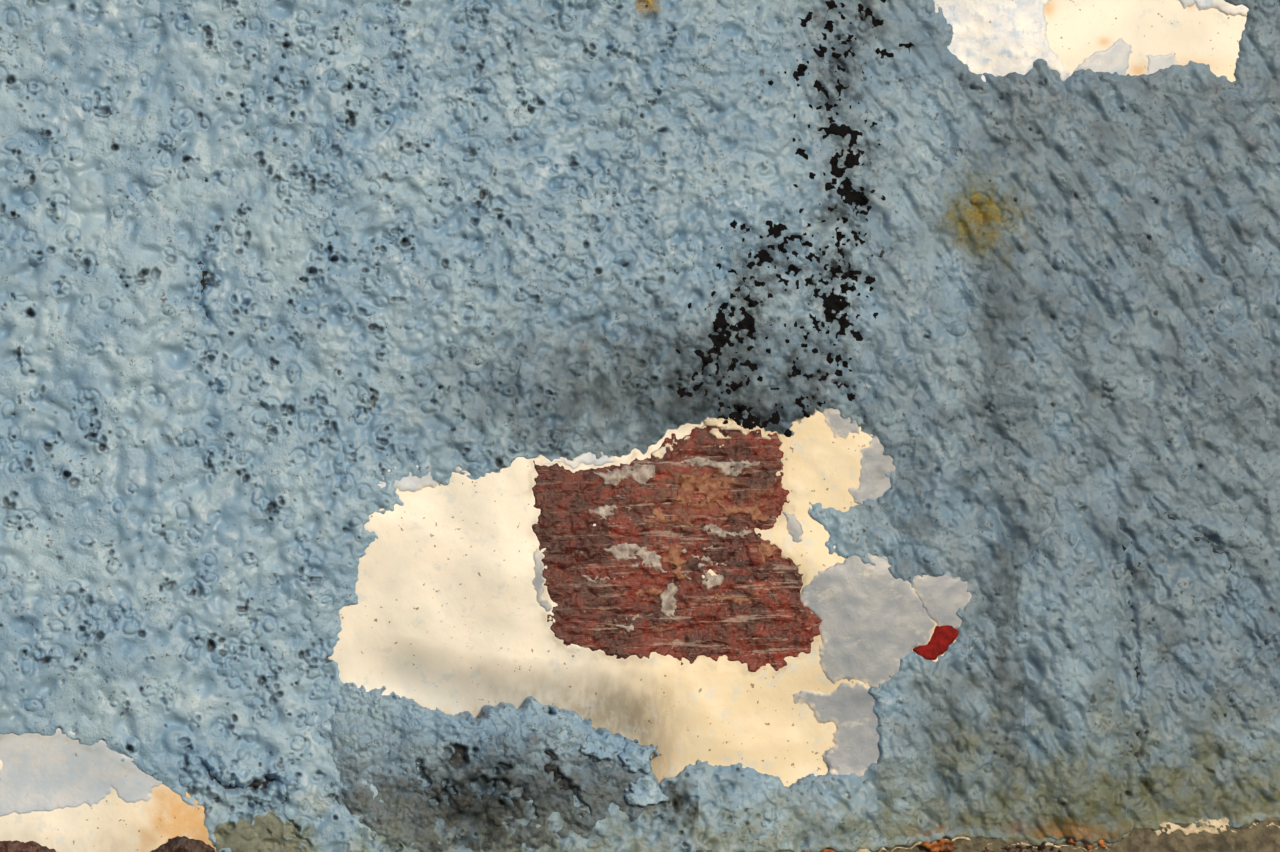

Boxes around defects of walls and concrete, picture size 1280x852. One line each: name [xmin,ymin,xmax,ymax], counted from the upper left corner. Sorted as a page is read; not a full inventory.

peeling [933,0,1249,82]
peeling [327,408,972,787]
peeling [0,728,310,852]